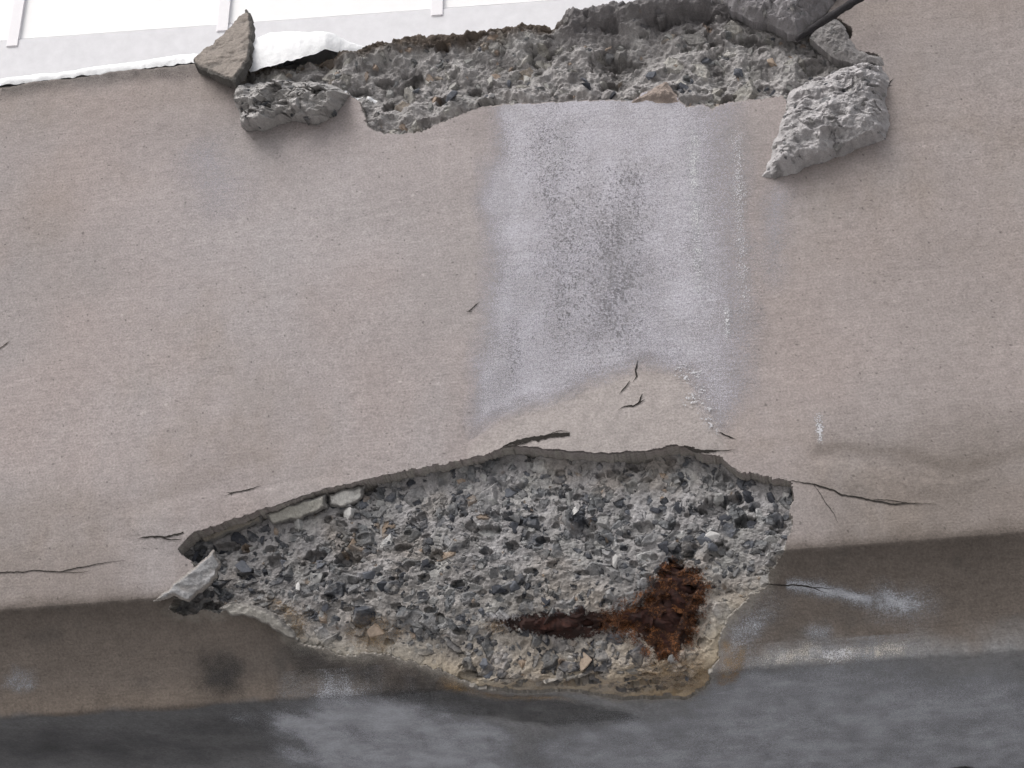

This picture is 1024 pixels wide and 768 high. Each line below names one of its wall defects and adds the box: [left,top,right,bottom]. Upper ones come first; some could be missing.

spalling [194,0,890,179]
water stain [467,90,793,438]
crack [0,560,125,573]
crack [137,532,183,540]
spalling [153,454,794,697]
crack [503,430,570,447]
rust [480,555,715,691]
water stain [232,609,1024,768]
crack [620,361,643,409]
crack [791,480,929,522]